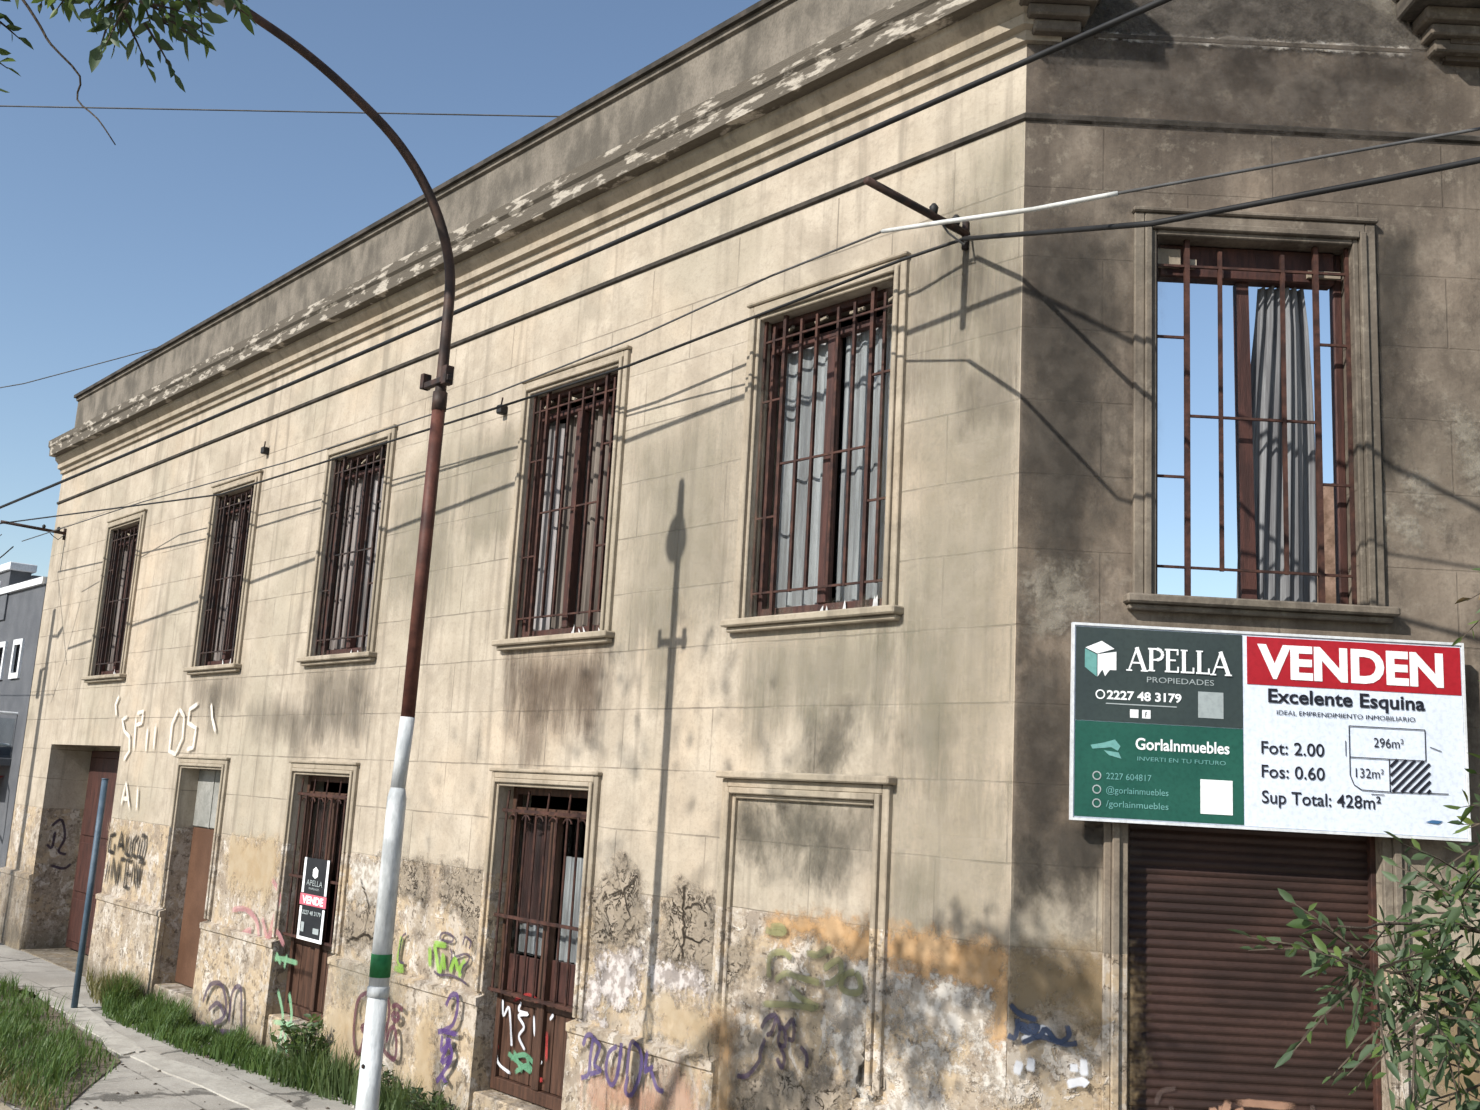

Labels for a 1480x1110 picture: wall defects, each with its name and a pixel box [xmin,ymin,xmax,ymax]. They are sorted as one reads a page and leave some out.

water stain [1376,236,1411,397]
water stain [1019,233,1125,591]
water stain [1380,418,1390,468]
water stain [523,658,594,758]
water stain [1013,669,1104,903]
spalling [398,855,490,961]
crack [608,875,637,935]
crack [680,886,710,959]
peeling [323,997,363,1070]
peeling [410,1003,439,1103]
peeling [576,852,1102,1110]
peeling [1435,981,1480,1110]